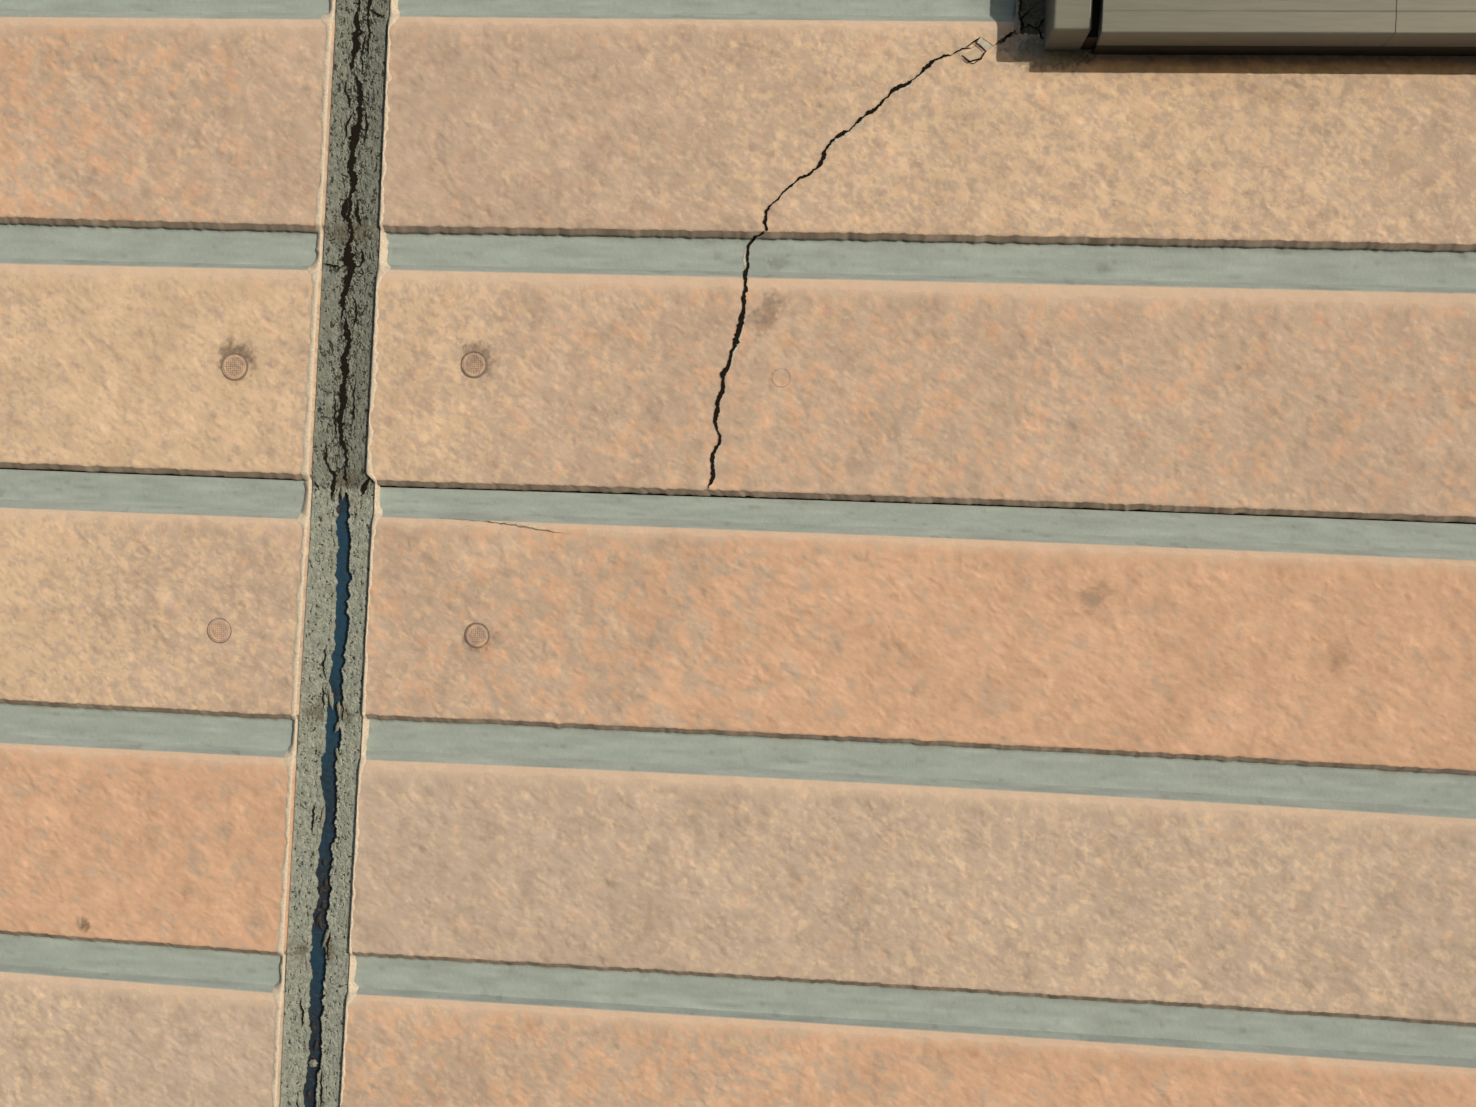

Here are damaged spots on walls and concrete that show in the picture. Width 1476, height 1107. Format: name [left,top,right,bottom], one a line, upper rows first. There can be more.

crack [281,0,391,1107]
crack [708,0,1045,489]